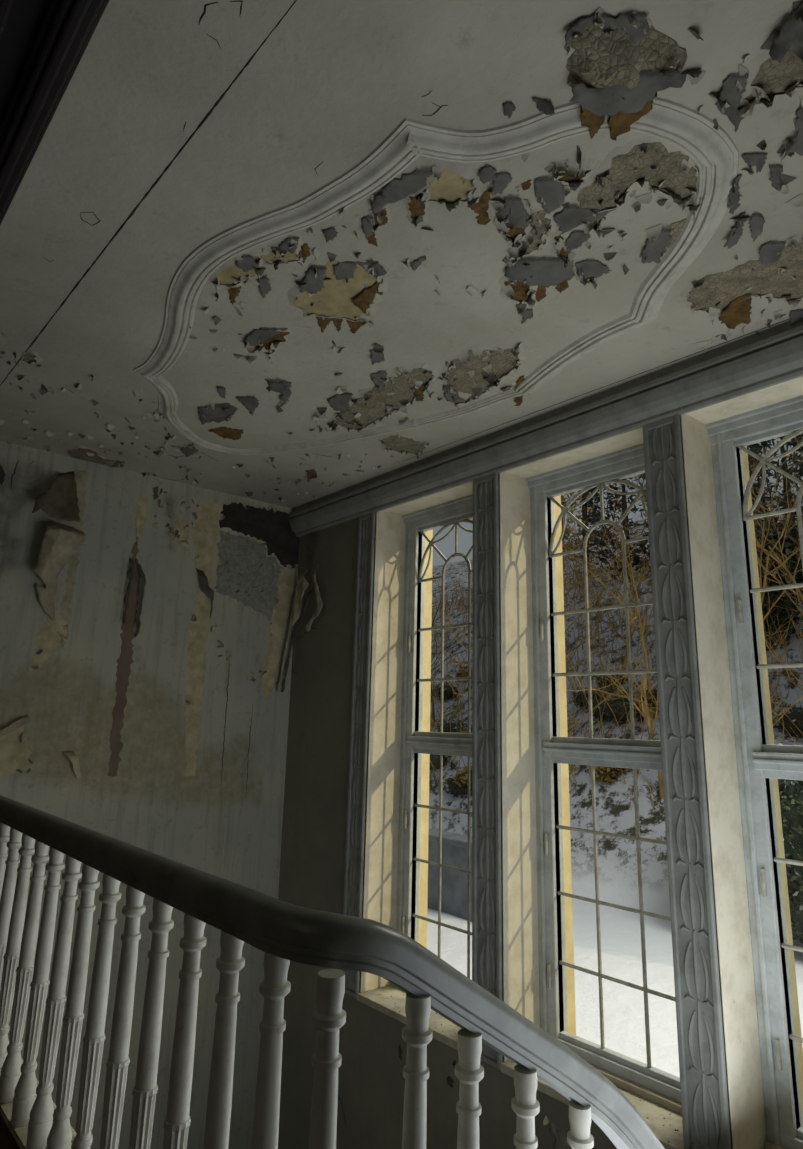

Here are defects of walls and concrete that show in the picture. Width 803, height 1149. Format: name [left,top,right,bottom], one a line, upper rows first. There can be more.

peeling [204,136,703,363]
peeling [680,1,803,350]
peeling [0,350,214,485]
peeling [197,381,292,440]
peeling [217,343,527,572]
peeling [543,1116,572,1149]